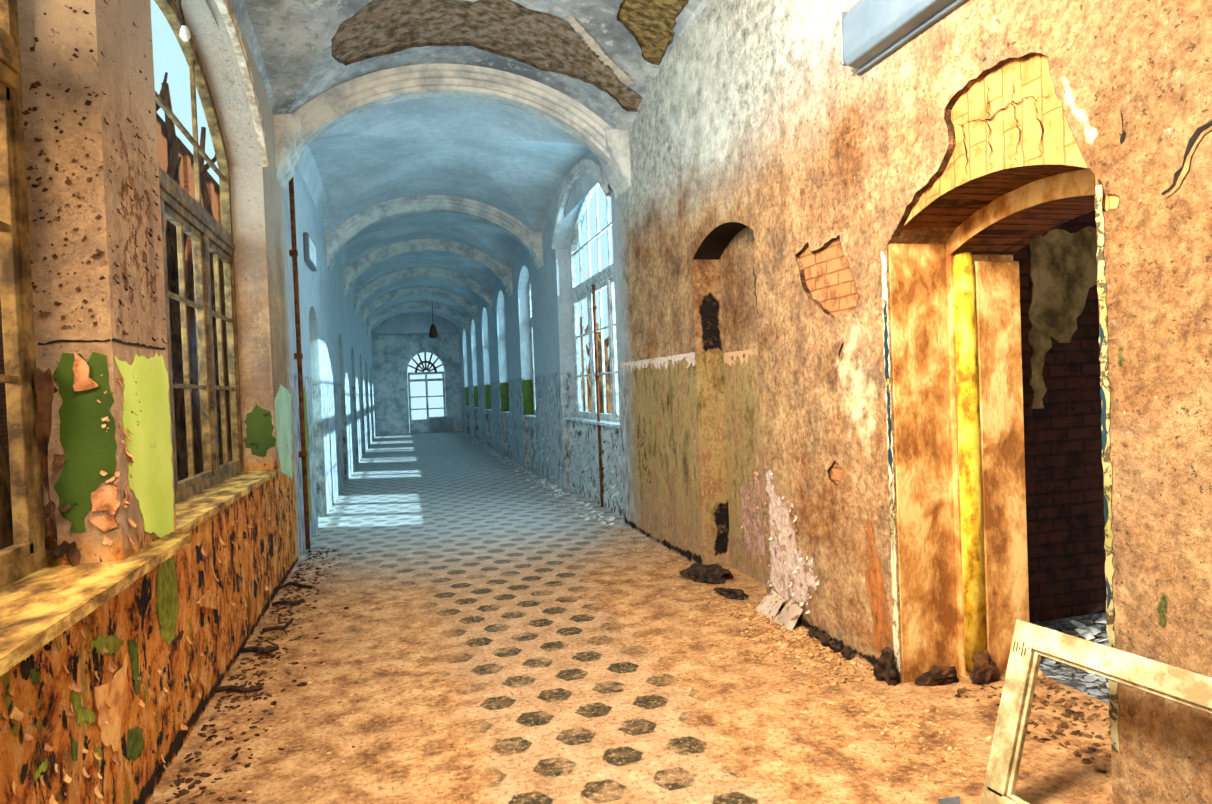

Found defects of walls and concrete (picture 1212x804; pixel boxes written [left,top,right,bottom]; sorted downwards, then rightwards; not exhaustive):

flaking render [331,0,642,112]
flaking render [617,0,689,65]
crack [1162,121,1212,198]
flaking render [795,236,859,319]
flaking render [891,52,1119,648]
peeling [33,367,81,567]
peeling [89,372,142,551]
peeling [186,479,296,699]
peeling [738,467,820,614]
peeling [881,251,900,673]
flaking render [0,644,171,804]
peeling [1108,679,1120,754]